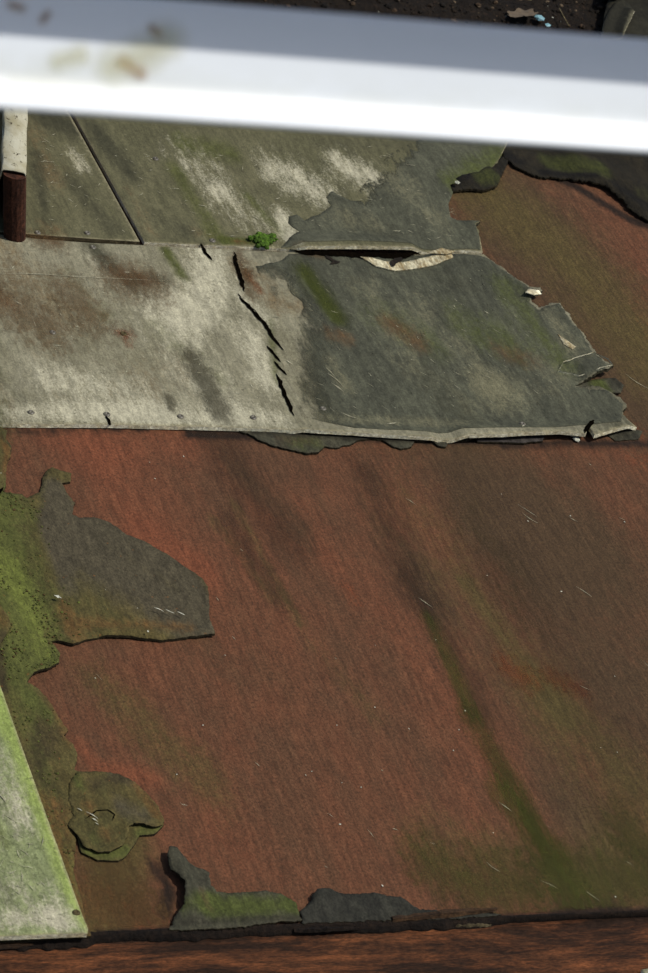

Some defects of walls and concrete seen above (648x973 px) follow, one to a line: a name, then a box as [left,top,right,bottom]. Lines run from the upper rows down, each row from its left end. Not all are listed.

damp [183,350,231,421]
crack [201,244,294,415]
peeling [234,138,648,455]
peeling [0,427,215,943]
peeling [167,846,502,932]